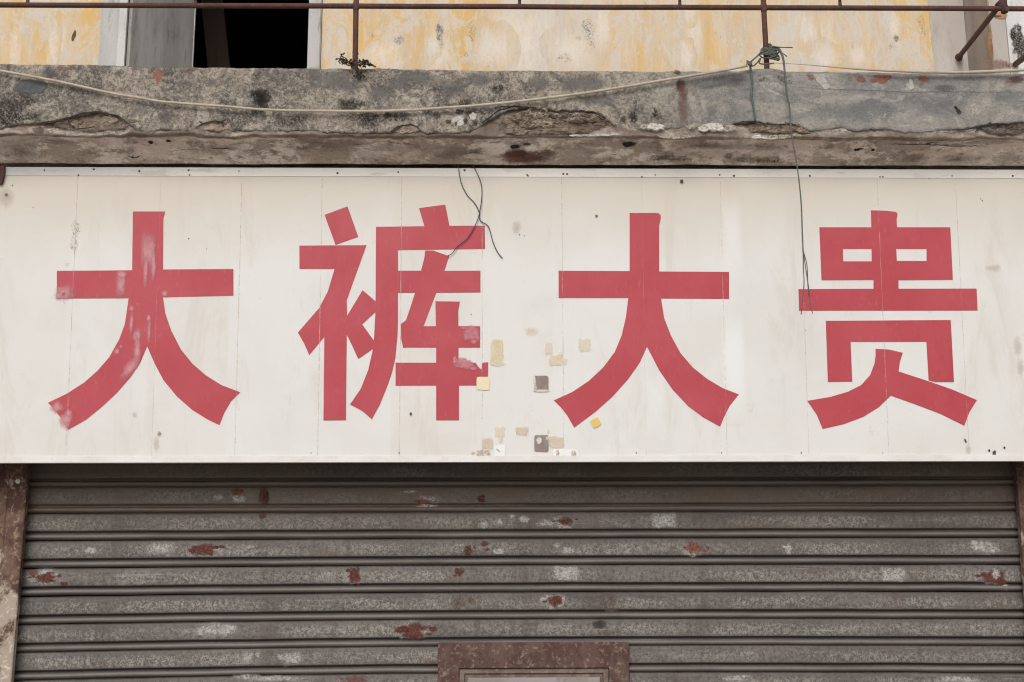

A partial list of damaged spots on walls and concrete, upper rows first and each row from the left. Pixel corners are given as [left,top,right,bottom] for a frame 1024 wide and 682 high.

spalling [32,113,142,136]
spalling [497,107,636,147]
corrosion [189,544,224,556]
corrosion [25,570,68,586]
corrosion [975,569,1007,586]
corrosion [540,595,565,608]
corrosion [395,622,437,640]